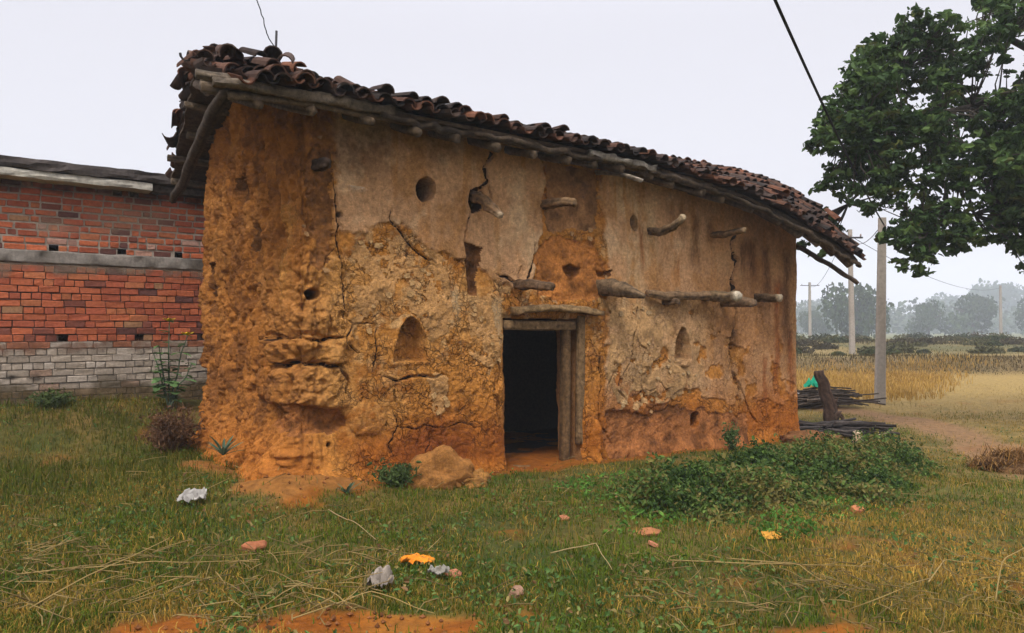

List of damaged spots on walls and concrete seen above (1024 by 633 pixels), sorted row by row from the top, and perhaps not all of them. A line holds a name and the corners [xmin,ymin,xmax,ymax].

spalling [301,136,343,273]
spalling [415,176,436,202]
spalling [468,186,483,213]
crack [479,152,493,189]
spalling [303,287,321,300]
crack [264,182,474,456]
peeling [345,239,455,341]
peeling [464,242,503,376]
spalling [533,161,749,459]
crack [729,235,737,291]
peeling [426,372,450,415]
spalling [270,401,346,450]